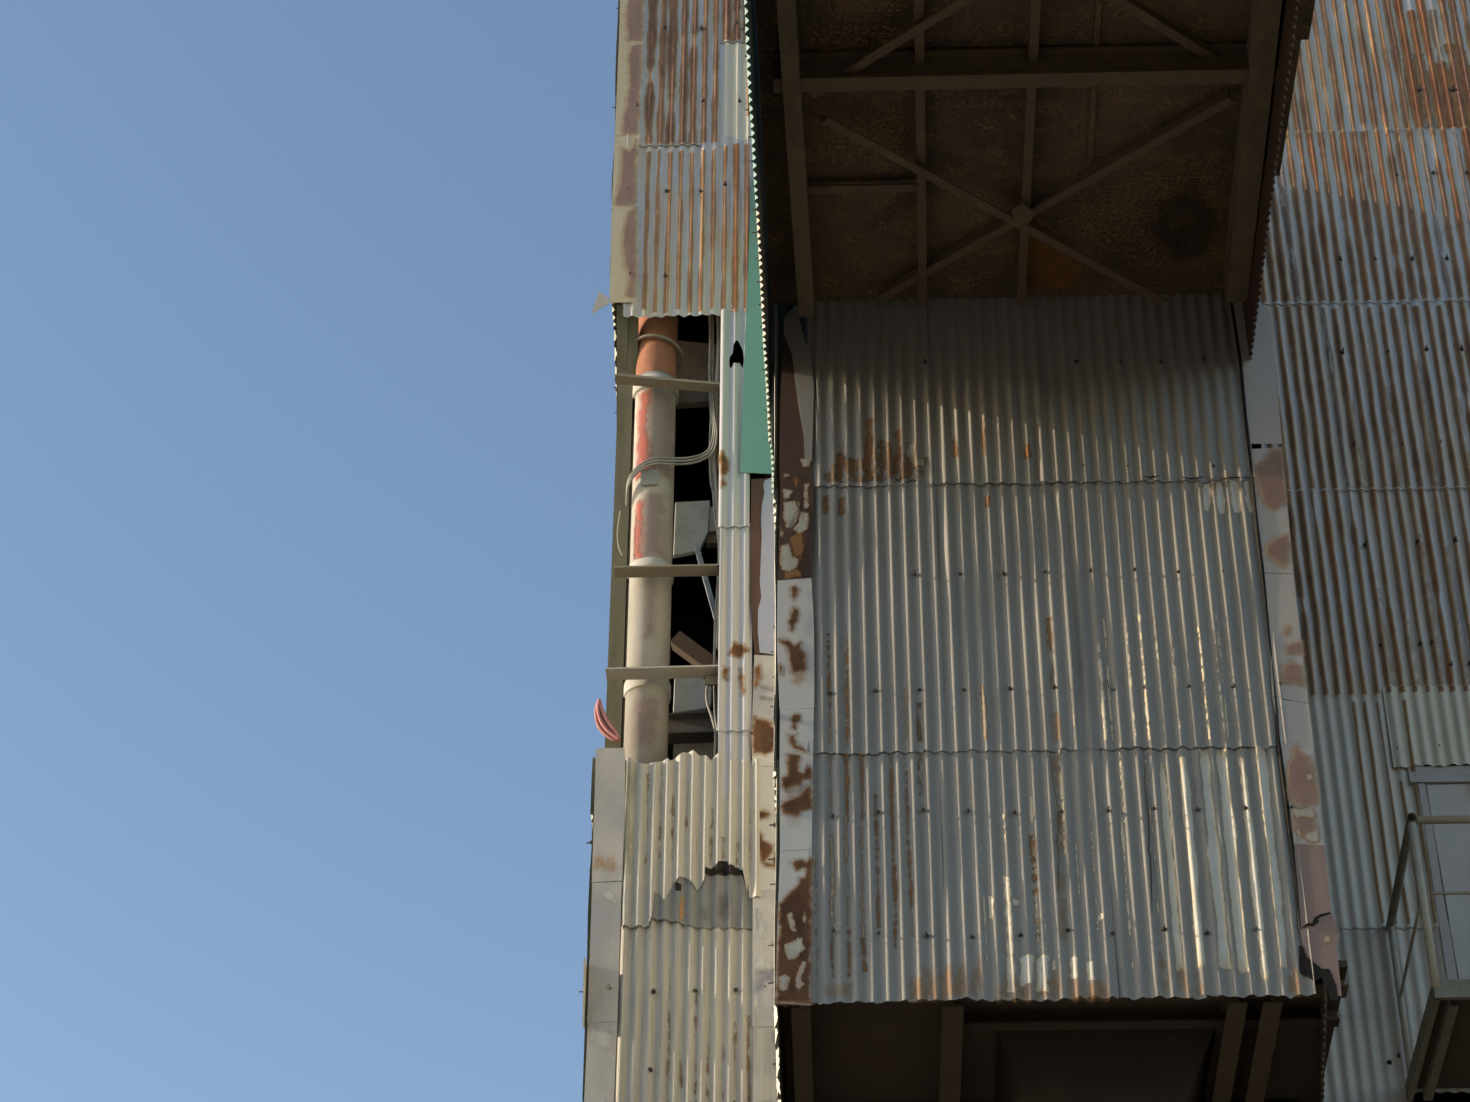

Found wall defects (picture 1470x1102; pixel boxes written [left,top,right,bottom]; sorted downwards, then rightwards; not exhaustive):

rust [615,0,749,378]
rust [823,418,927,515]
rust [1260,0,1470,924]
peeling [779,458,824,673]
rust [752,715,774,755]
rust [913,970,975,996]
peeling [980,845,1096,993]
peeling [1058,749,1105,934]
peeling [1097,618,1134,971]
peeling [1125,614,1179,740]
peeling [1144,614,1320,981]